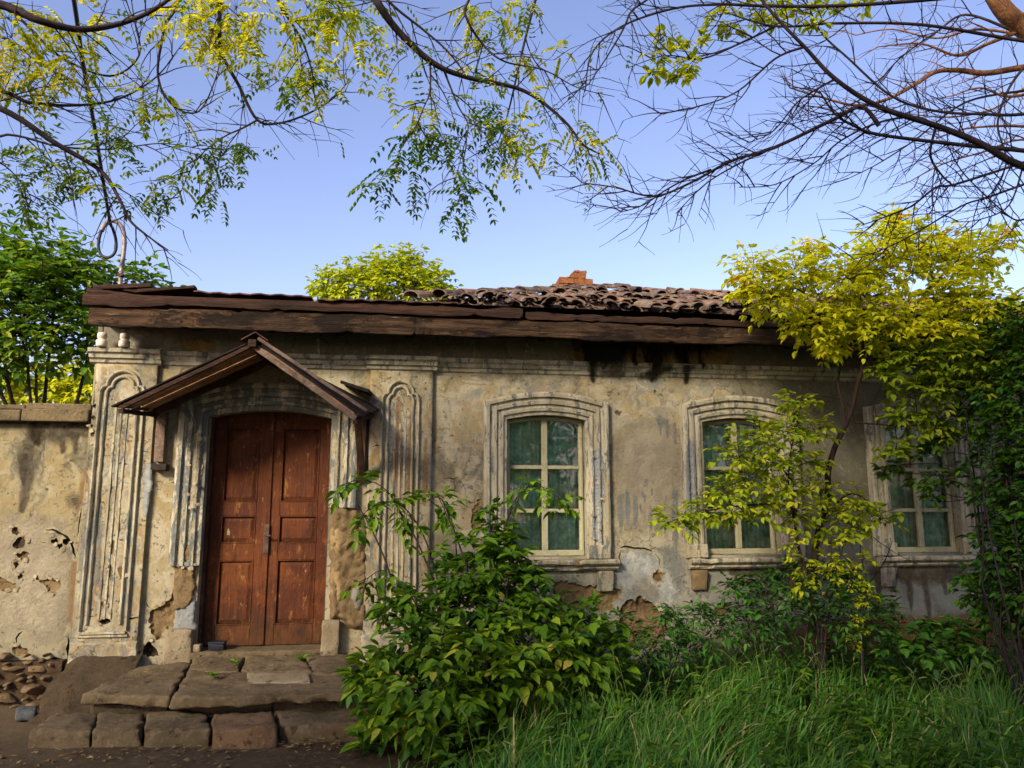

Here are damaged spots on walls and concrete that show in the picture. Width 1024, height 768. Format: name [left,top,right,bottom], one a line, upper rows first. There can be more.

leakage [585,342,705,384]
leakage [19,422,87,513]
peeling [186,433,203,509]
flaking render [0,526,61,596]
peeling [552,417,697,650]
crack [618,546,660,565]
flaking render [9,643,29,656]
flaking render [141,593,198,658]